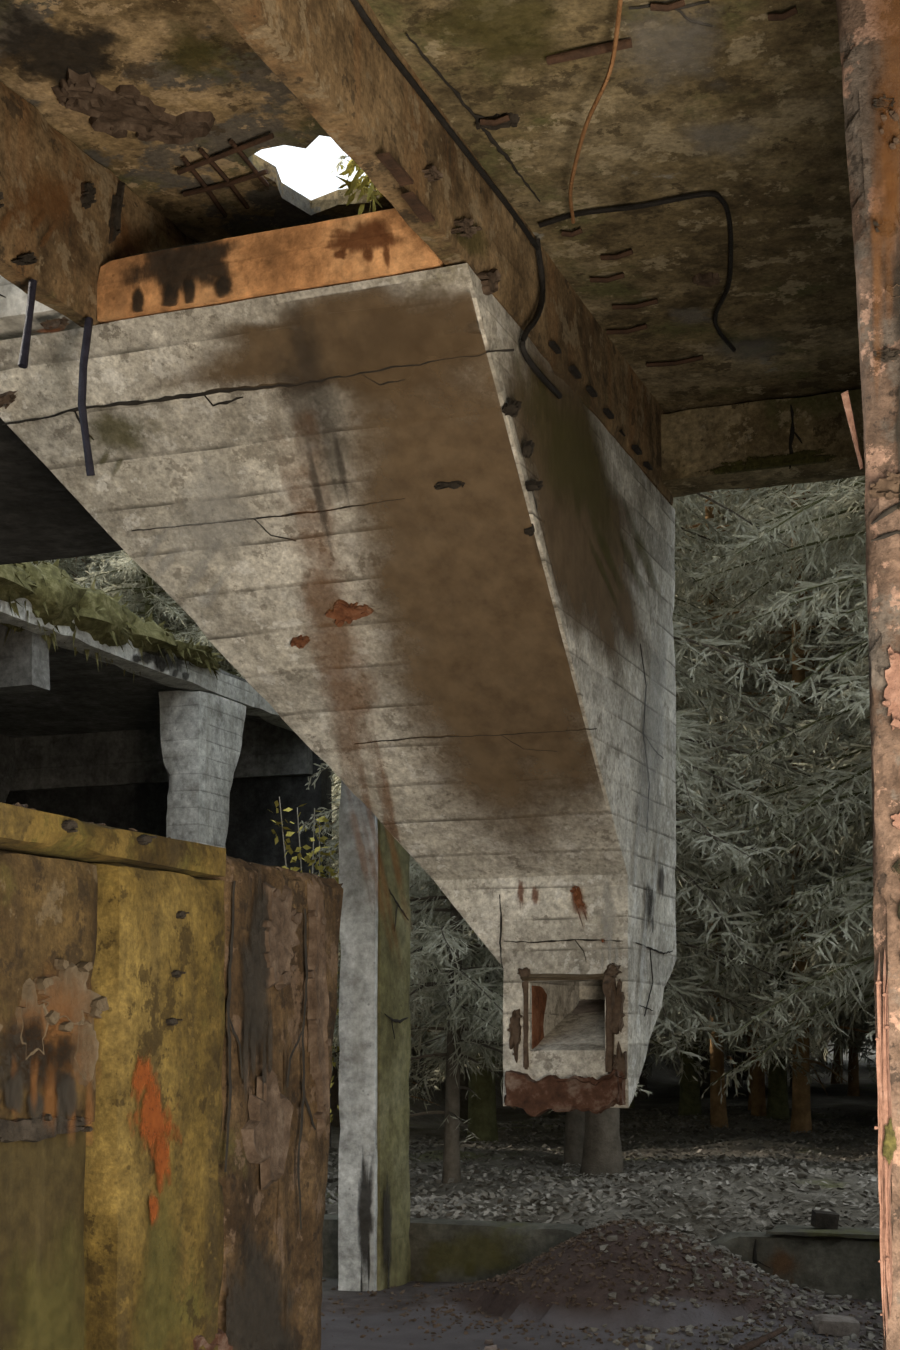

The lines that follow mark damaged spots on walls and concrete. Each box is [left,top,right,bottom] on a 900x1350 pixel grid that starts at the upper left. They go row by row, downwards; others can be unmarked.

corrosion [326,221,394,266]
leakage [191,287,657,842]
leakage [133,648,189,681]
peeling [882,645,900,731]
peeling [890,813,900,830]
peeling [0,959,109,1087]
corrosion [130,1058,179,1225]